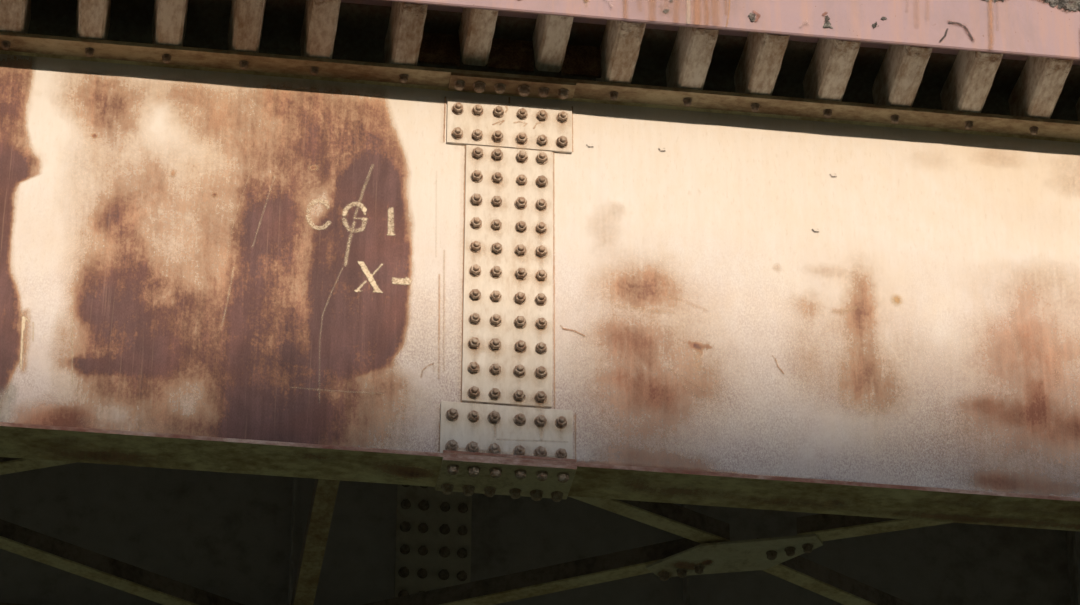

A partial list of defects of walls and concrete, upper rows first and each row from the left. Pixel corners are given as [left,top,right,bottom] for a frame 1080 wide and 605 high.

spalling [1039,0,1080,12]
rust [0,56,40,410]
rust [15,74,412,459]
rust [575,265,740,474]